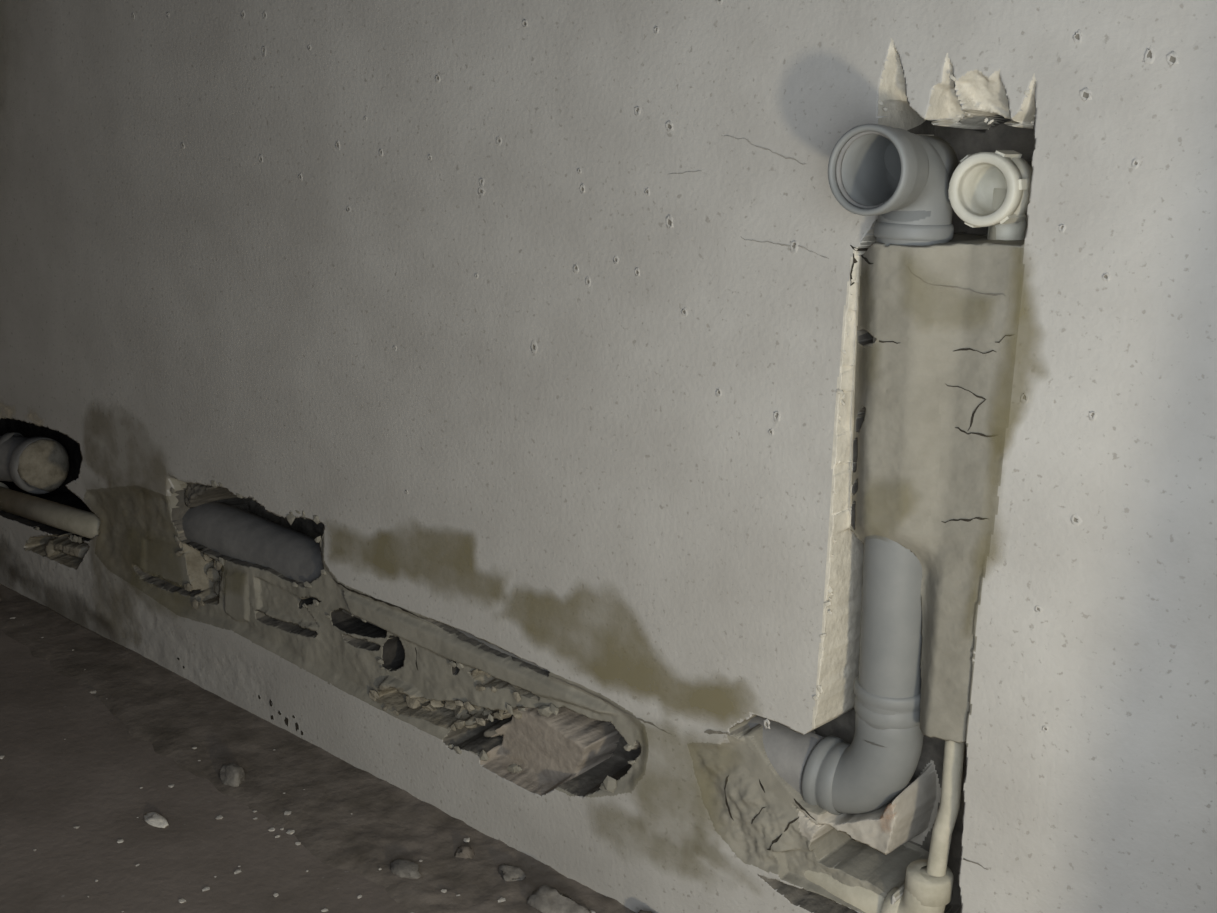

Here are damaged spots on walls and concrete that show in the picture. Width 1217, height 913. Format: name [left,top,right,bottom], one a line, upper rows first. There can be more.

flaking render [878,38,1037,130]
crack [955,334,1015,354]
crack [946,384,997,437]
spalling [0,416,94,513]
spalling [0,510,99,570]
water stain [364,533,500,598]
crack [941,516,988,524]
spalling [170,480,641,797]
water stain [586,631,739,720]